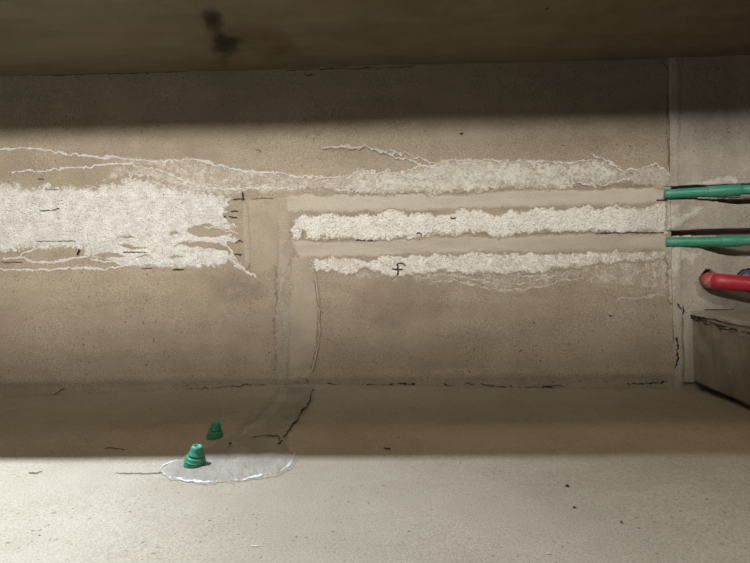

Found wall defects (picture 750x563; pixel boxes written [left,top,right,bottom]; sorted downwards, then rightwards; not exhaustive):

damp [0,143,747,278]
damp [308,247,704,303]
crack [253,383,339,445]
crack [443,381,565,389]